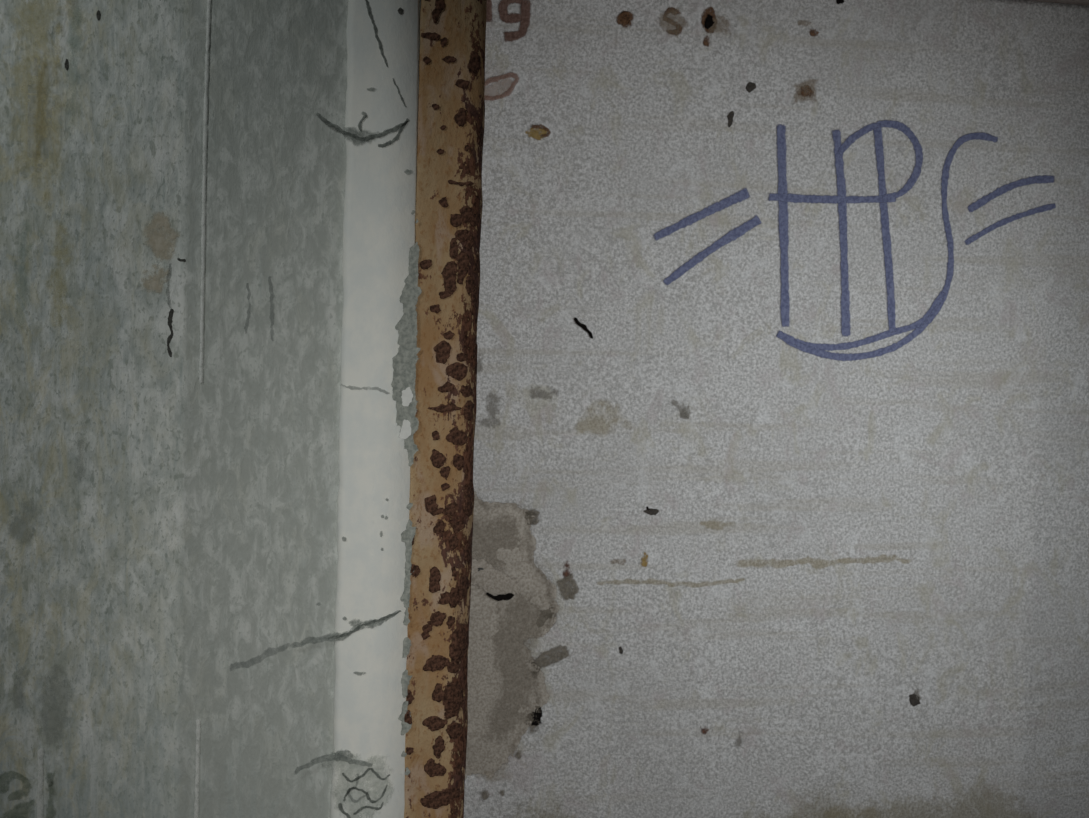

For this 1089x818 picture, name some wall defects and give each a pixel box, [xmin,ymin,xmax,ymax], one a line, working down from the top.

crack [316,0,410,147]
corrosion [421,0,481,89]
corrosion [440,108,467,130]
corrosion [420,197,481,314]
corrosion [404,330,478,809]
crack [294,610,401,647]